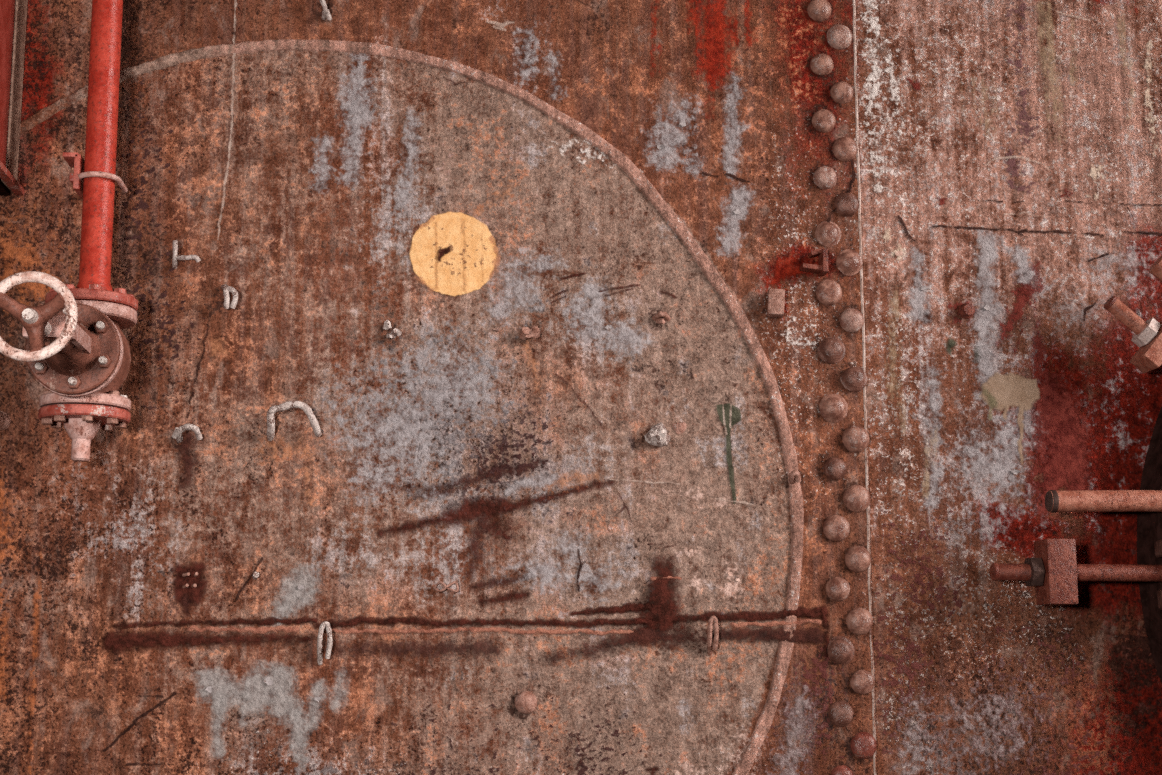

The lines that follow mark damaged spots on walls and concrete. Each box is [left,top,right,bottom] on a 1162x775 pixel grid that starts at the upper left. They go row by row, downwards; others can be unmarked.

peeling [640,100,703,174]
peeling [858,0,903,202]
rust [115,76,216,432]
peeling [718,186,755,255]
peeling [974,230,1035,400]
rust [304,321,614,604]
peeling [929,369,1035,522]
rust [172,562,209,616]
rust [862,483,1149,775]
peeling [198,665,345,769]
rust [254,675,670,775]
rust [751,646,851,775]